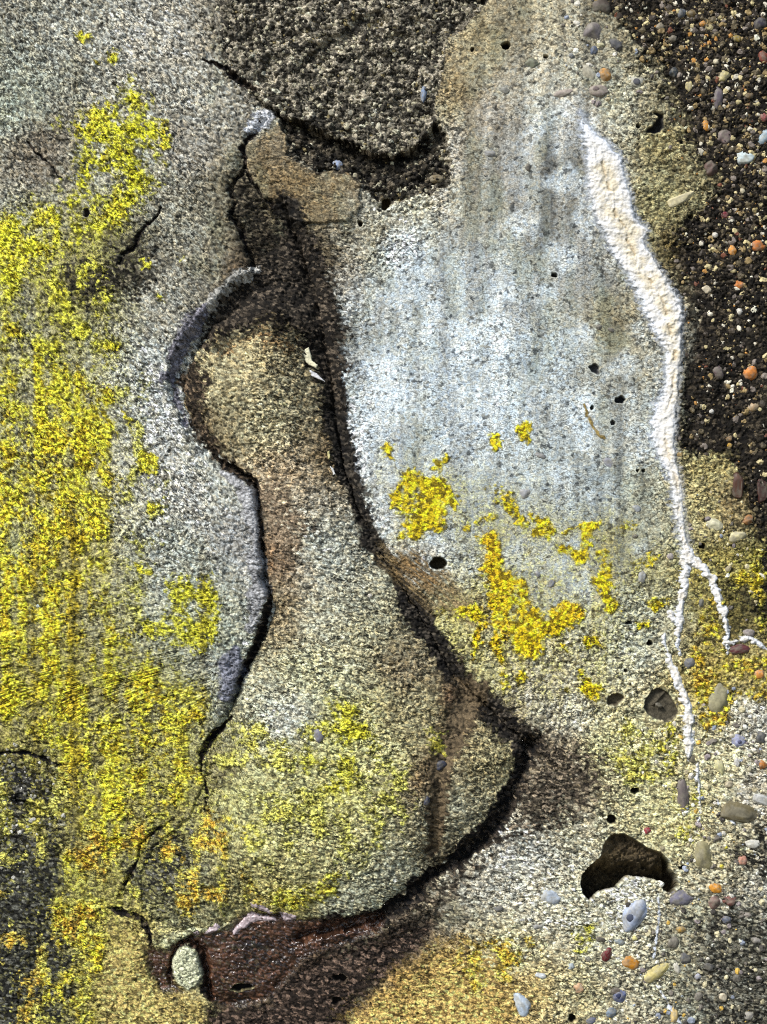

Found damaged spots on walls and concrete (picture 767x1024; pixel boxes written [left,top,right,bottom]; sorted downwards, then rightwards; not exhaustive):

crack [202,58,257,93]
crack [120,206,162,261]
crack [190,425,273,684]
crack [0,750,65,767]
crack [199,716,233,813]
crack [5,795,56,820]
spalling [579,832,681,903]
crack [108,817,214,1002]